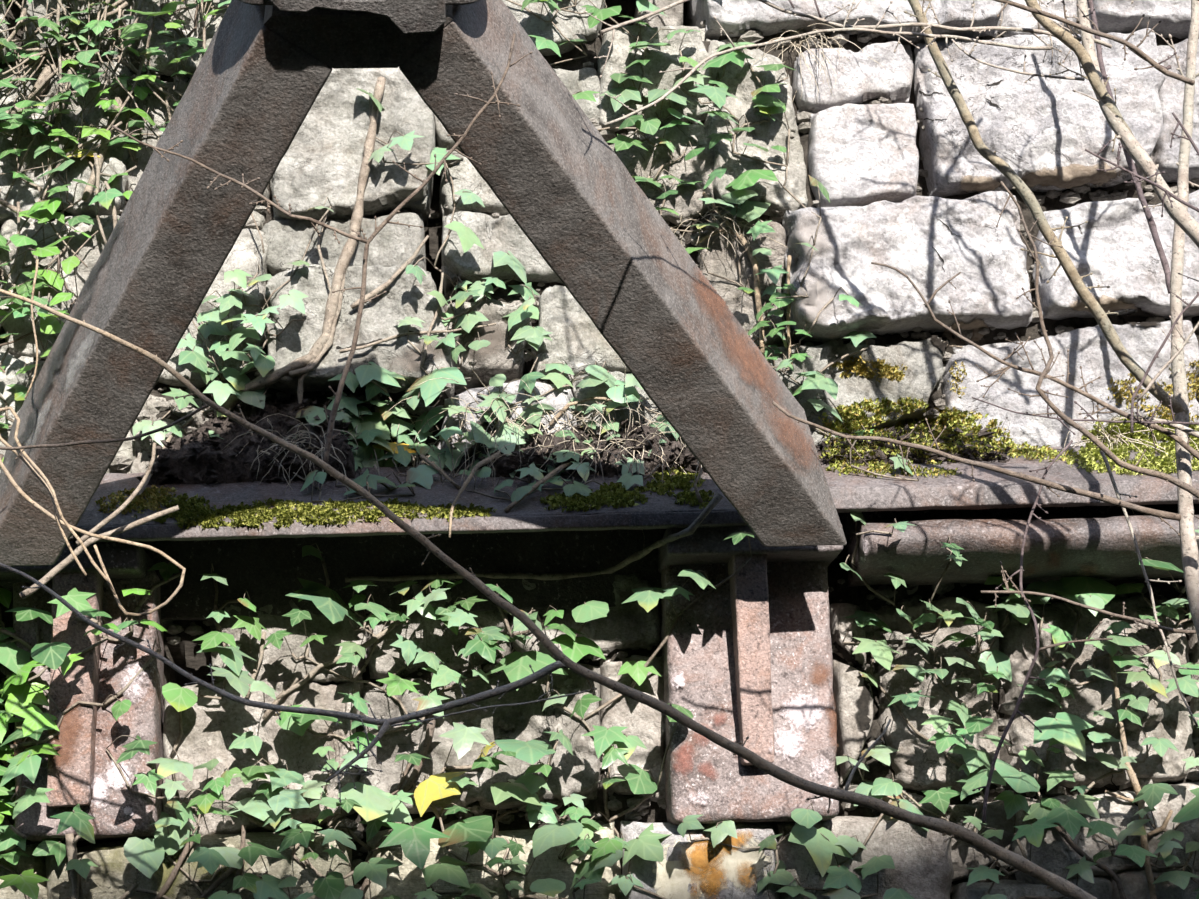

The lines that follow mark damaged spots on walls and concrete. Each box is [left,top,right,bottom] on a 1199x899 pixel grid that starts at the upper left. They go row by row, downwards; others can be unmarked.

rust [696,275,772,393]
rust [51,708,78,766]
rust [682,834,751,899]